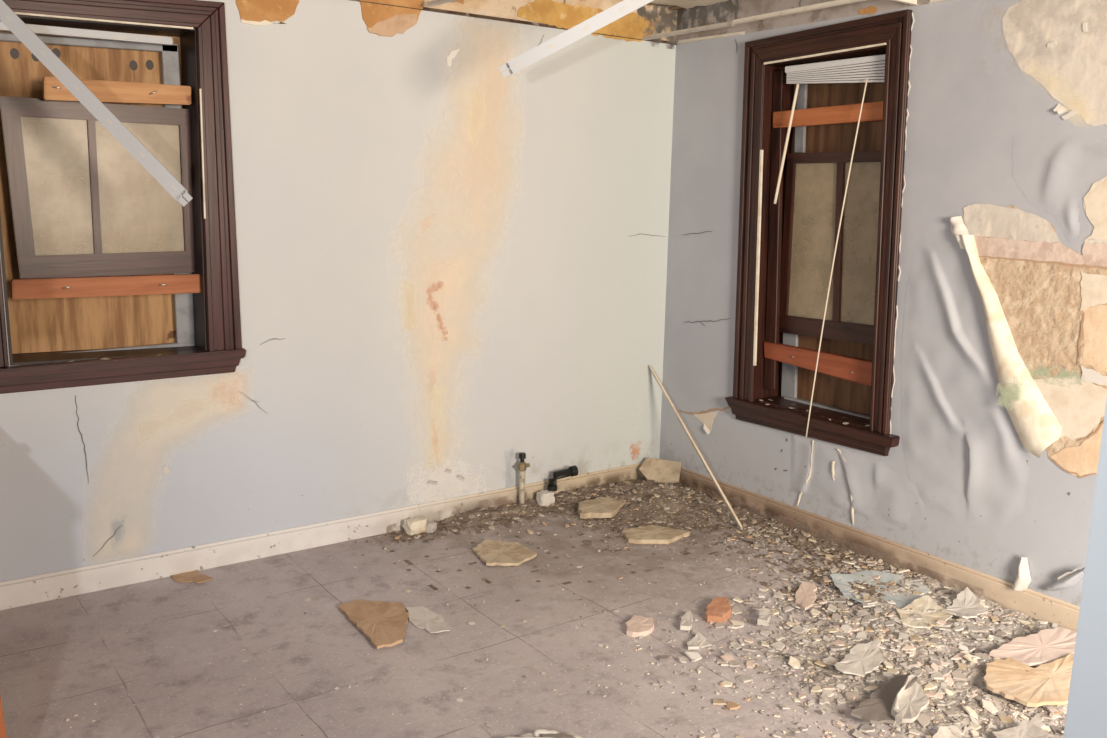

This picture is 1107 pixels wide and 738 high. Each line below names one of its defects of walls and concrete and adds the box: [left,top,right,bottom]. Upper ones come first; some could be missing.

flaking render [236,0,299,25]
flaking render [359,0,424,37]
flaking render [517,0,604,29]
flaking render [591,12,659,42]
peeling [1002,0,1107,126]
water stain [404,23,527,515]
spalling [963,176,1107,479]
crack [75,395,89,483]
water stain [89,371,249,562]